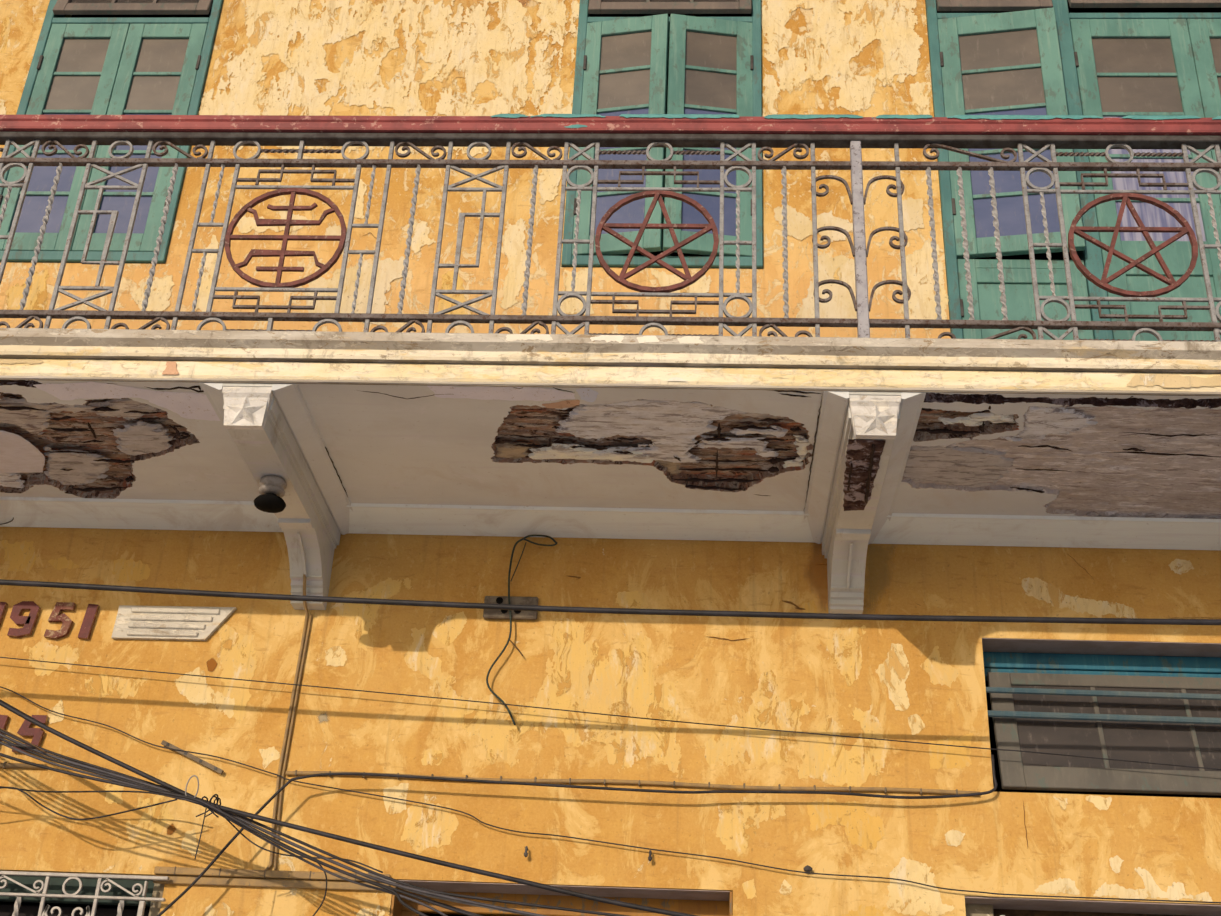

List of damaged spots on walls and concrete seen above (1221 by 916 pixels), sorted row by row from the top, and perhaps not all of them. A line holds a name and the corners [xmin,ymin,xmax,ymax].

peeling [198,0,739,128]
peeling [761,0,1103,119]
peeling [277,146,493,159]
spalling [0,380,220,499]
spalling [427,386,813,492]
spalling [843,439,886,511]
spalling [901,374,1221,519]
peeling [404,612,685,779]
peeling [704,661,889,787]
peeling [827,625,960,735]
peeling [886,857,954,916]
peeling [1034,855,1213,902]